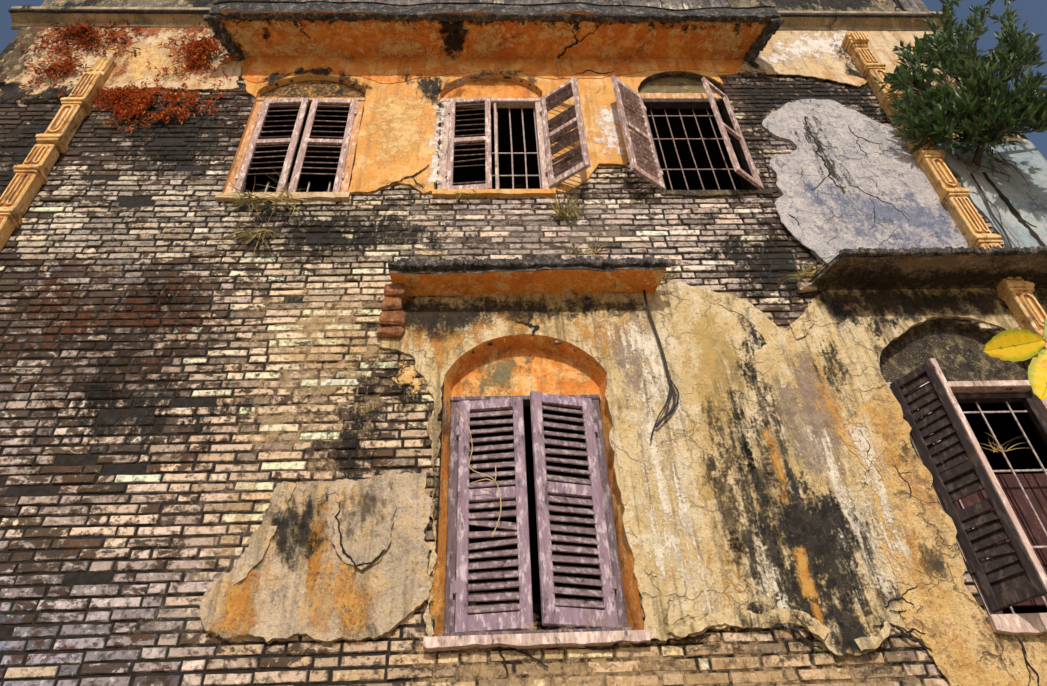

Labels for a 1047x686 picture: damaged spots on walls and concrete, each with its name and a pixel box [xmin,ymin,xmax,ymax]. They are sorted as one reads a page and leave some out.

damp [430,20,629,58]
crack [558,21,614,74]
damp [631,0,715,33]
peeling [729,30,968,266]
crack [804,104,908,230]
crack [982,172,1046,246]
peeling [717,293,815,348]
flaking render [392,354,430,412]
damp [271,373,393,571]
damp [403,296,910,668]
crack [334,502,385,567]
peeling [645,608,892,656]